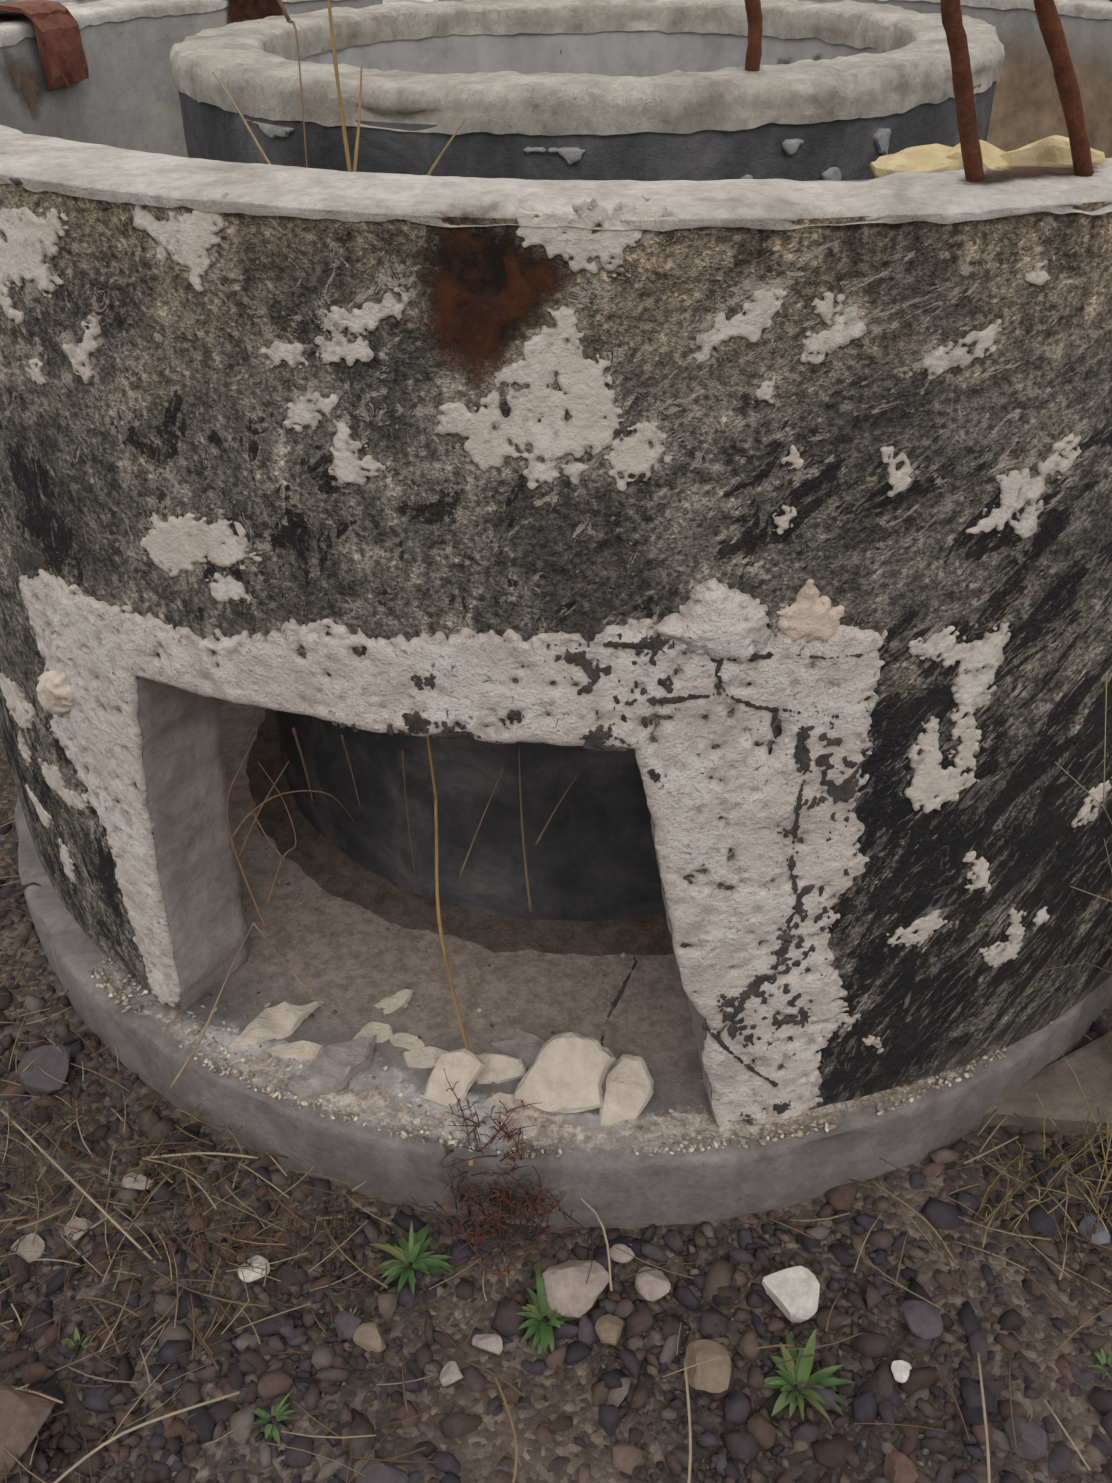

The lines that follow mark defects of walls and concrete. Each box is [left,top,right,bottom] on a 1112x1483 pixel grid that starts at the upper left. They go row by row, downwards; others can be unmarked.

corrosion [227,0,284,24]
corrosion [960,163,1097,182]
corrosion [422,210,571,382]
peeling [434,306,673,492]
peeling [140,512,262,604]
crack [402,713,503,745]
crack [583,731,630,747]
peeling [900,622,1011,814]
crack [603,640,863,981]
spalling [0,569,949,1148]
peeling [979,906,1050,968]
crack [701,1022,778,1087]